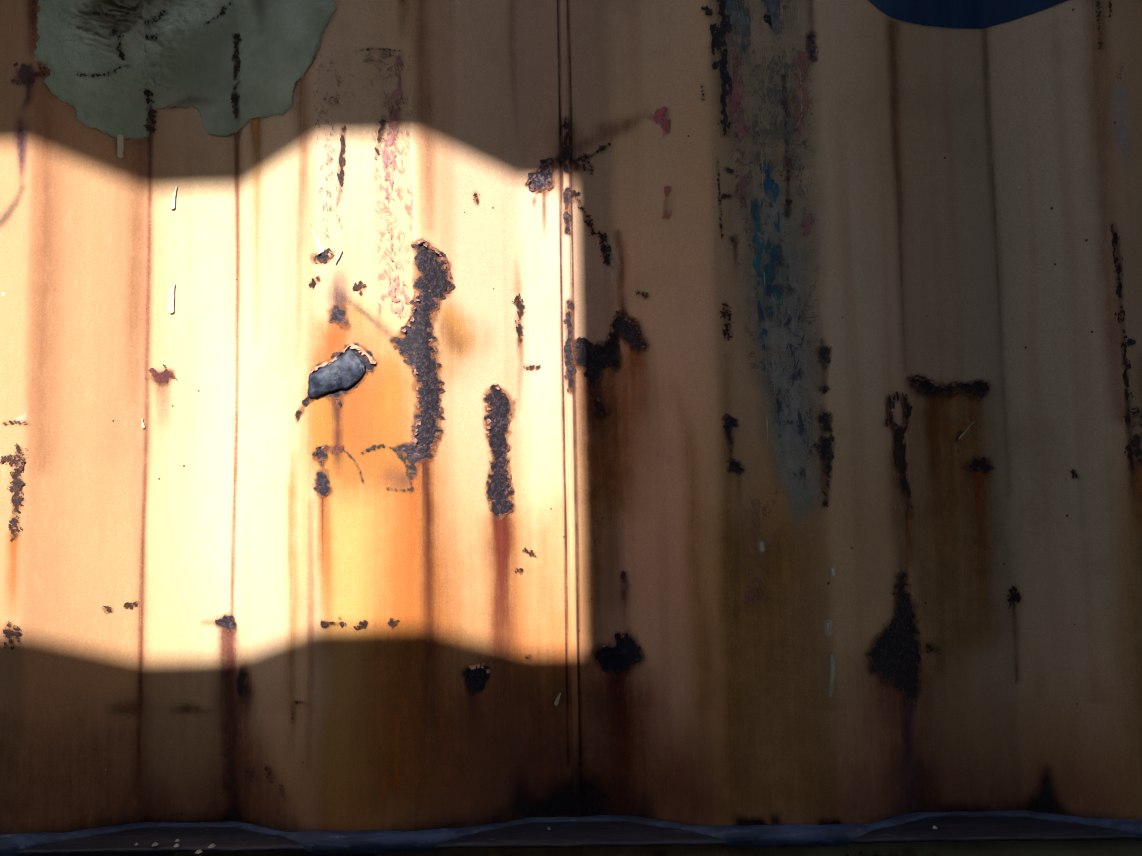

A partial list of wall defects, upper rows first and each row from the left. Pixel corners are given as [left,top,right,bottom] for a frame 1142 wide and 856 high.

peeling [710,0,733,136]
peeling [718,302,734,343]
rust [0,443,27,590]
rust [394,0,653,831]
peeling [723,414,745,475]
rust [886,391,913,565]